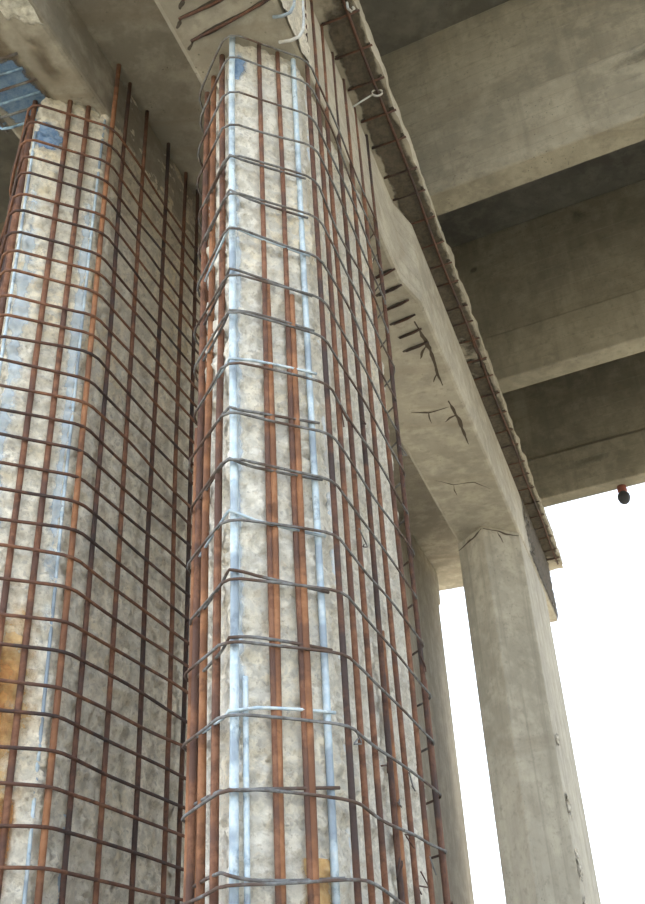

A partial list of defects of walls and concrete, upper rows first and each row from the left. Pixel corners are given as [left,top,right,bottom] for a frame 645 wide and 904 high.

spalling [176,0,224,29]
spalling [187,0,270,51]
spalling [281,0,312,65]
spalling [321,0,560,620]
crack [414,321,469,444]
crack [459,528,519,551]
rust [0,632,27,758]
rust [0,773,14,866]